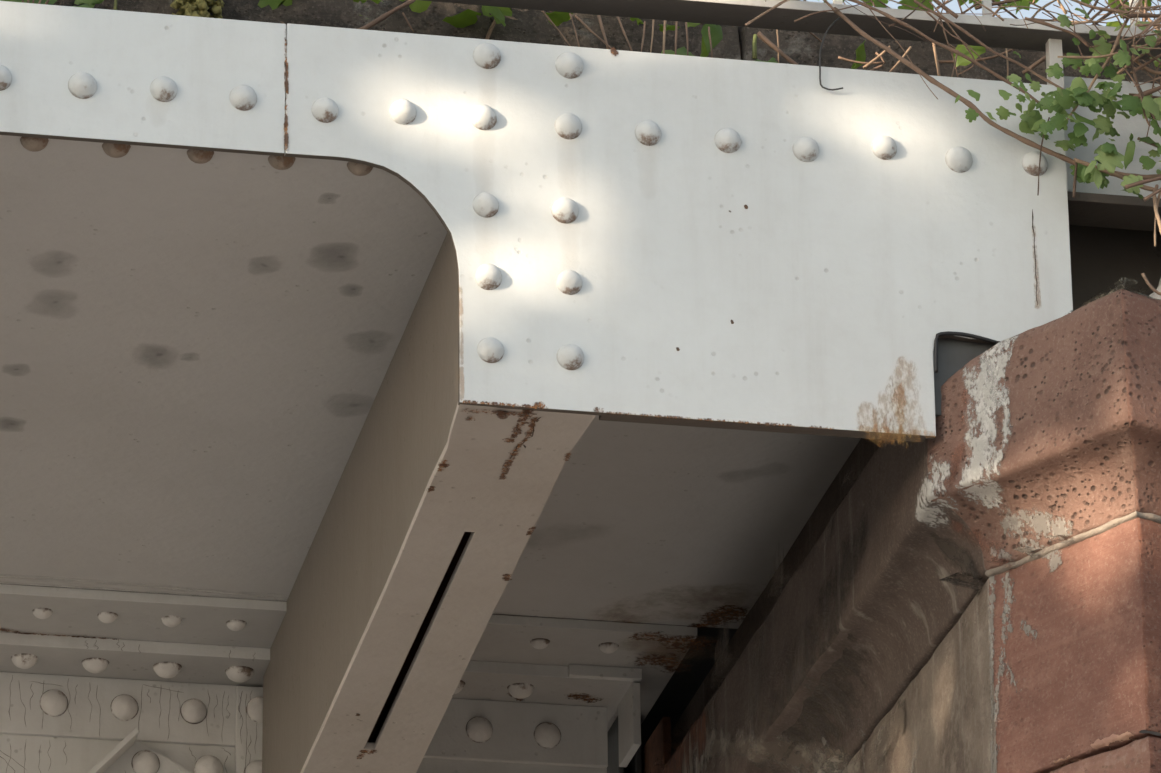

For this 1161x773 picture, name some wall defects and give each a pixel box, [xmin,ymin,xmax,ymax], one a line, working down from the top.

corrosion [461,400,545,480]
corrosion [595,407,832,430]
water stain [915,335,1074,773]
corrosion [0,628,117,640]
corrosion [629,605,748,673]
crack [0,675,101,773]
crack [138,684,257,773]